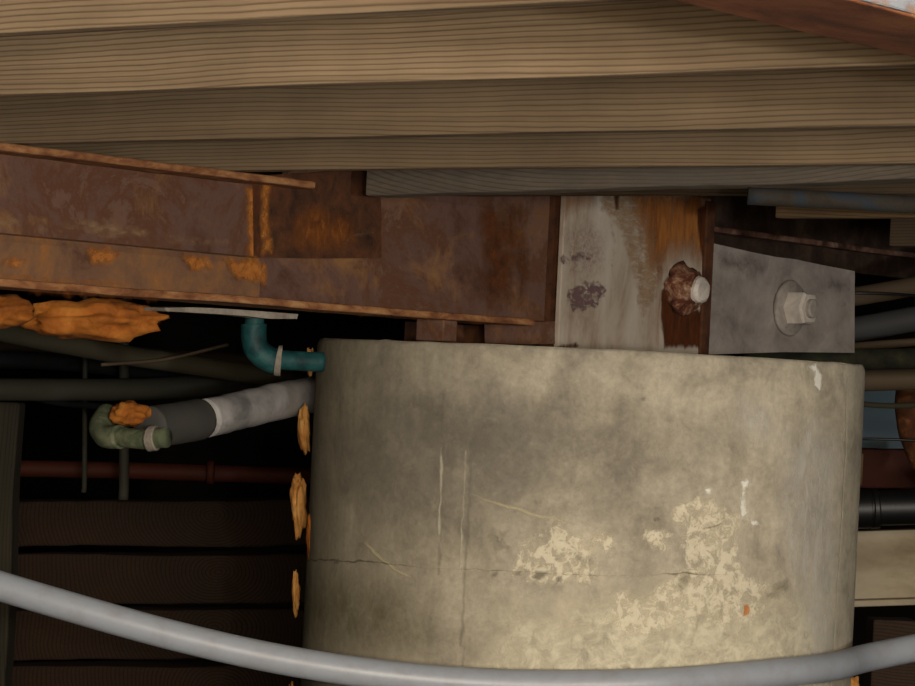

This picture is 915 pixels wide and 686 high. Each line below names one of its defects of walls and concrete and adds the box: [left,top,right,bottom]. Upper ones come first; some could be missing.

corrosion [229,185,272,284]
corrosion [603,196,706,348]